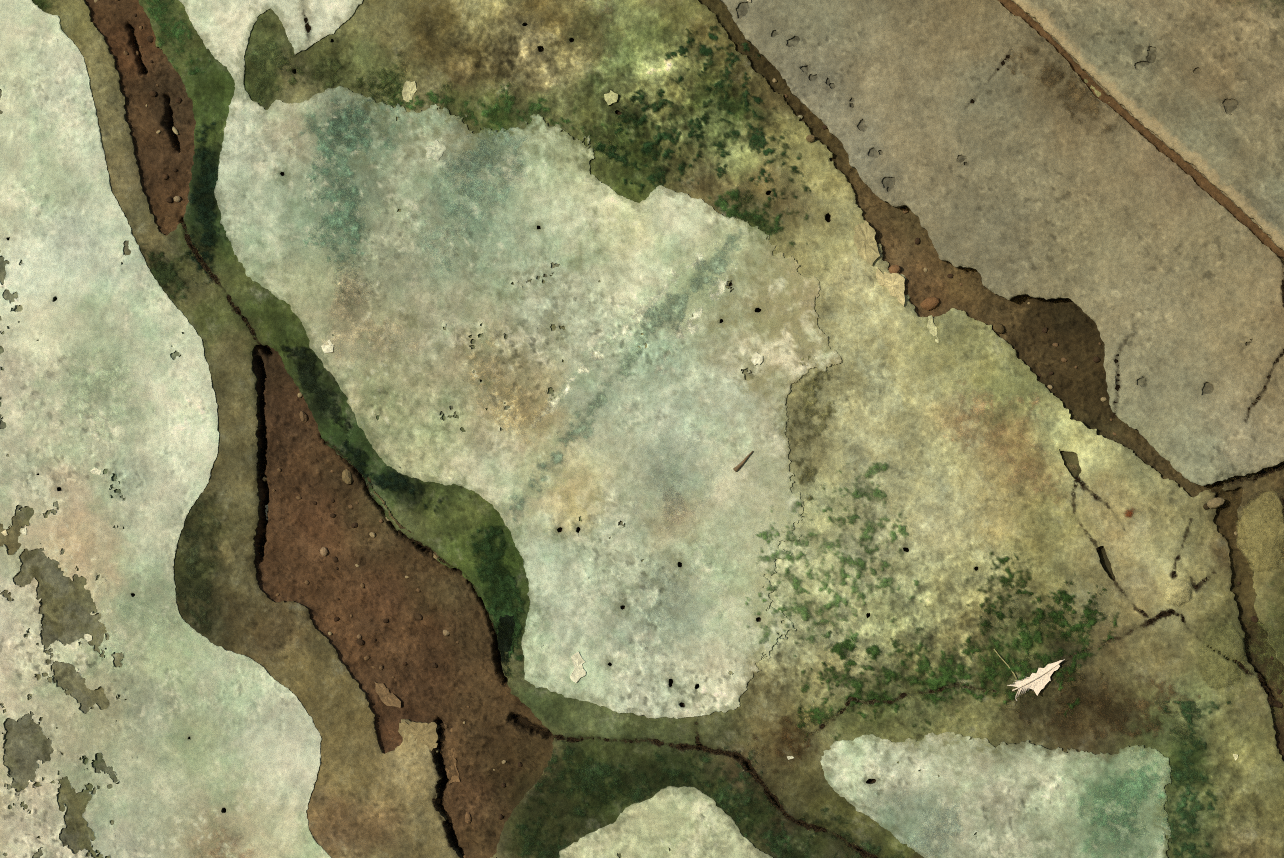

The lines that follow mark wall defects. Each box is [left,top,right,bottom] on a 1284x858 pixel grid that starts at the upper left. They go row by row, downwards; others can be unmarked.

peeling [0,250,23,370]
crack [1276,257,1284,307]
spalling [32,0,895,858]
crack [1072,478,1109,550]
crack [1112,354,1120,419]
crack [1230,463,1284,512]
crack [1248,349,1284,417]
crack [1108,519,1215,642]
peeling [0,502,127,858]
crack [1220,653,1276,706]
crack [431,720,464,856]
crack [513,714,878,858]